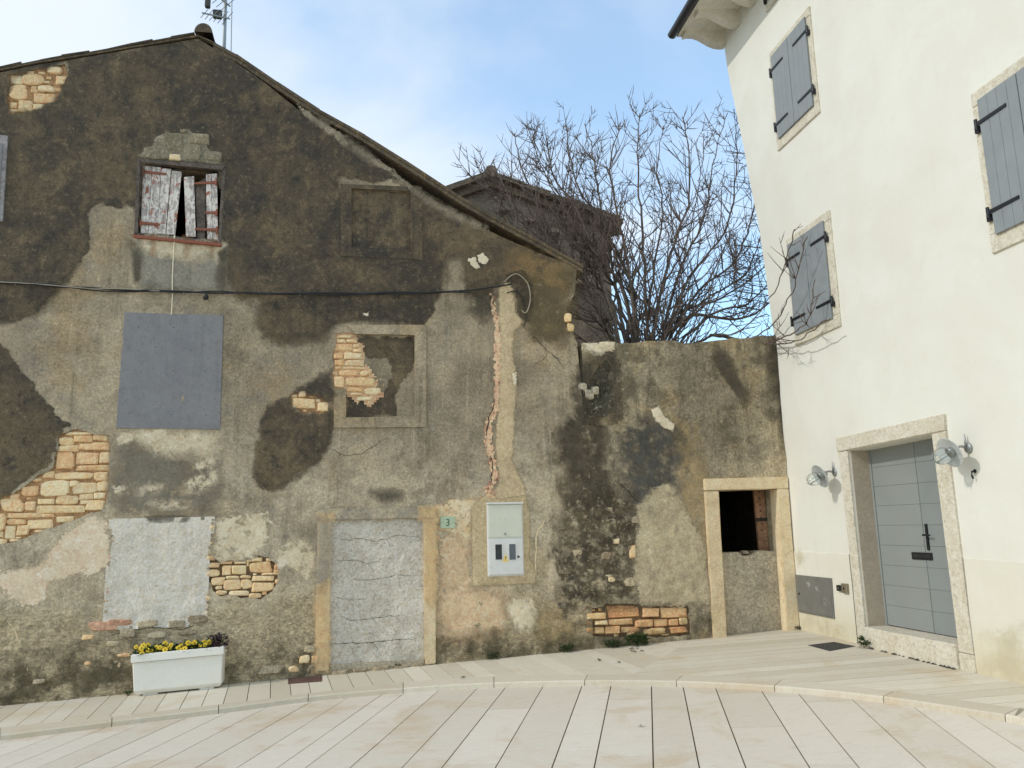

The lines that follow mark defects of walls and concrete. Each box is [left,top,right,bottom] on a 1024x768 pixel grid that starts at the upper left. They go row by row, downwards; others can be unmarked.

damp [132,236,227,290]
flaking render [0,39,561,492]
damp [470,287,491,318]
damp [507,266,575,342]
spalling [0,343,114,607]
spalling [82,510,316,657]
damp [466,637,528,658]
damp [538,410,706,654]
flaking render [586,483,711,638]
spalling [651,405,674,431]